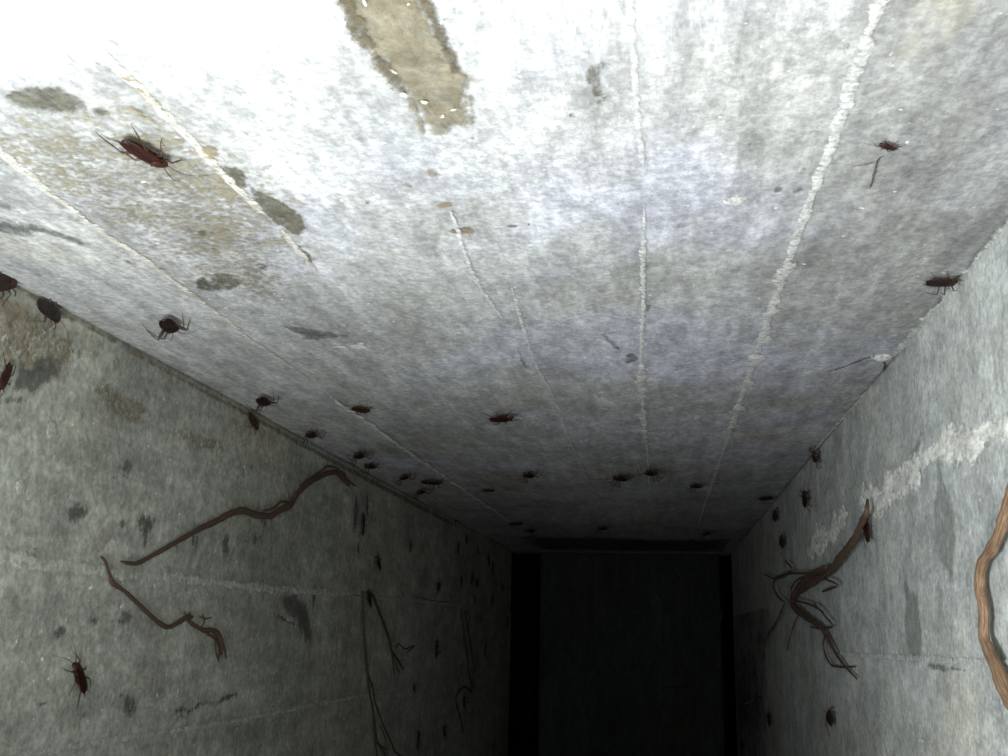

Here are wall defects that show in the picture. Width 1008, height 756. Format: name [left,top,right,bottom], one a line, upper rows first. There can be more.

damp [336,0,473,135]
damp [0,88,312,294]